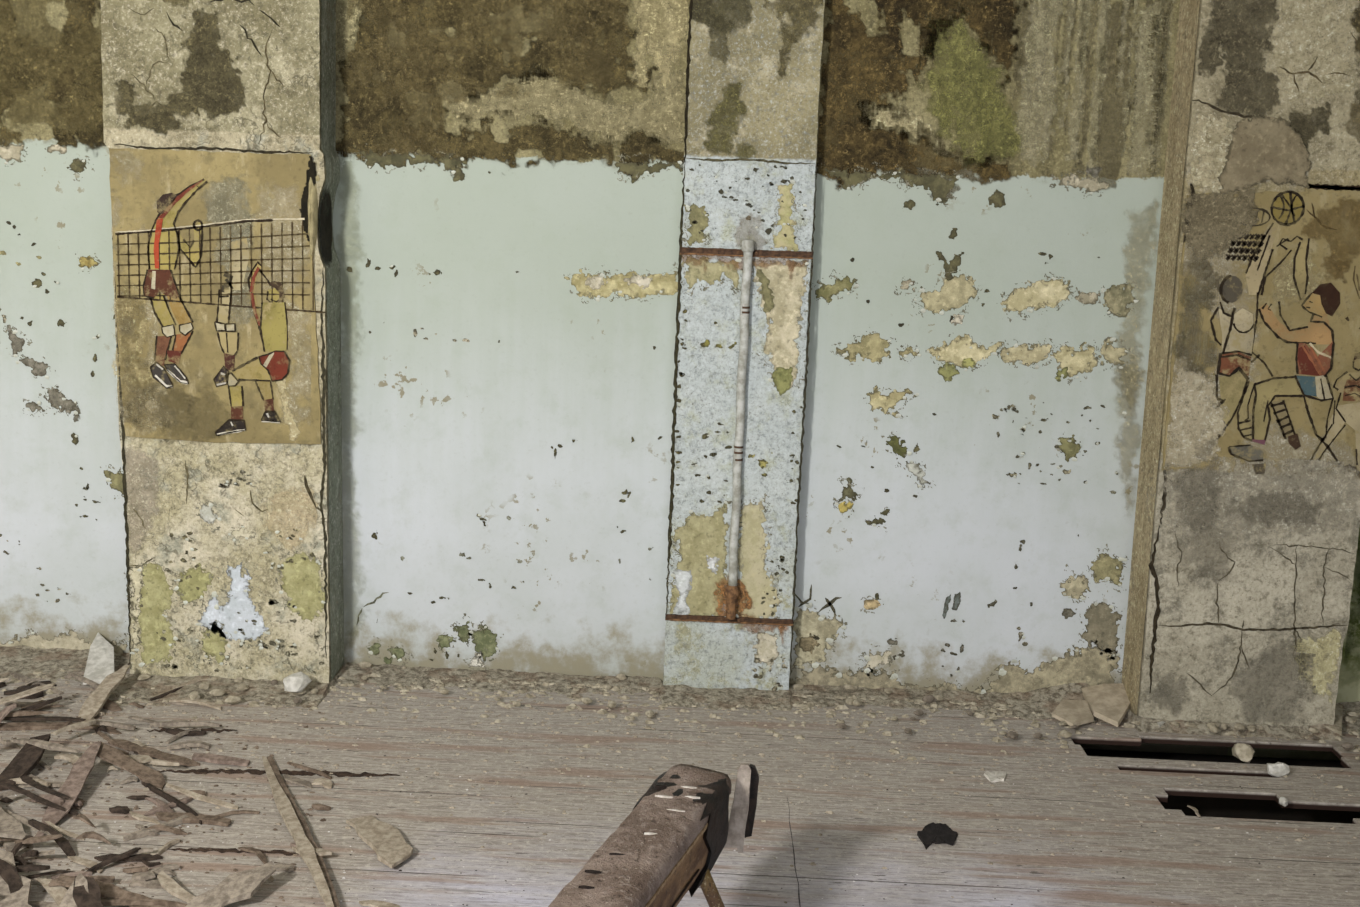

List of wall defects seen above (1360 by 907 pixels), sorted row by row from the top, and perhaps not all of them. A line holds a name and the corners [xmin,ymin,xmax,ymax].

crack [115,0,312,154]
peeling [357,143,467,182]
peeling [815,162,968,210]
peeling [988,189,1006,208]
peeling [0,308,81,445]
peeling [564,153,870,403]
water stain [263,0,1360,715]
peeling [831,228,1139,385]
peeling [111,501,328,673]
rust [714,578,786,634]
peeling [649,422,1127,694]
crack [1148,470,1354,696]